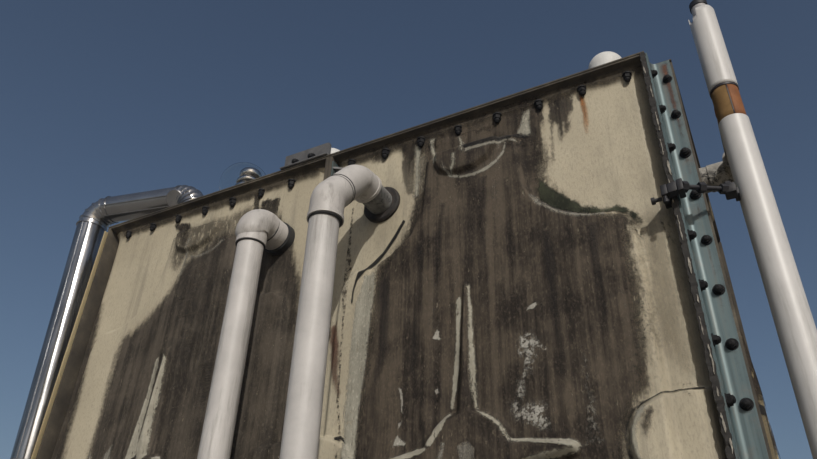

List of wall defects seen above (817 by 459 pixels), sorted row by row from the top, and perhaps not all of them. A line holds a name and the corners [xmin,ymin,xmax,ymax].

leakage [51,305,101,459]
leakage [87,167,318,459]
peeling [391,285,581,459]
leakage [338,65,705,459]